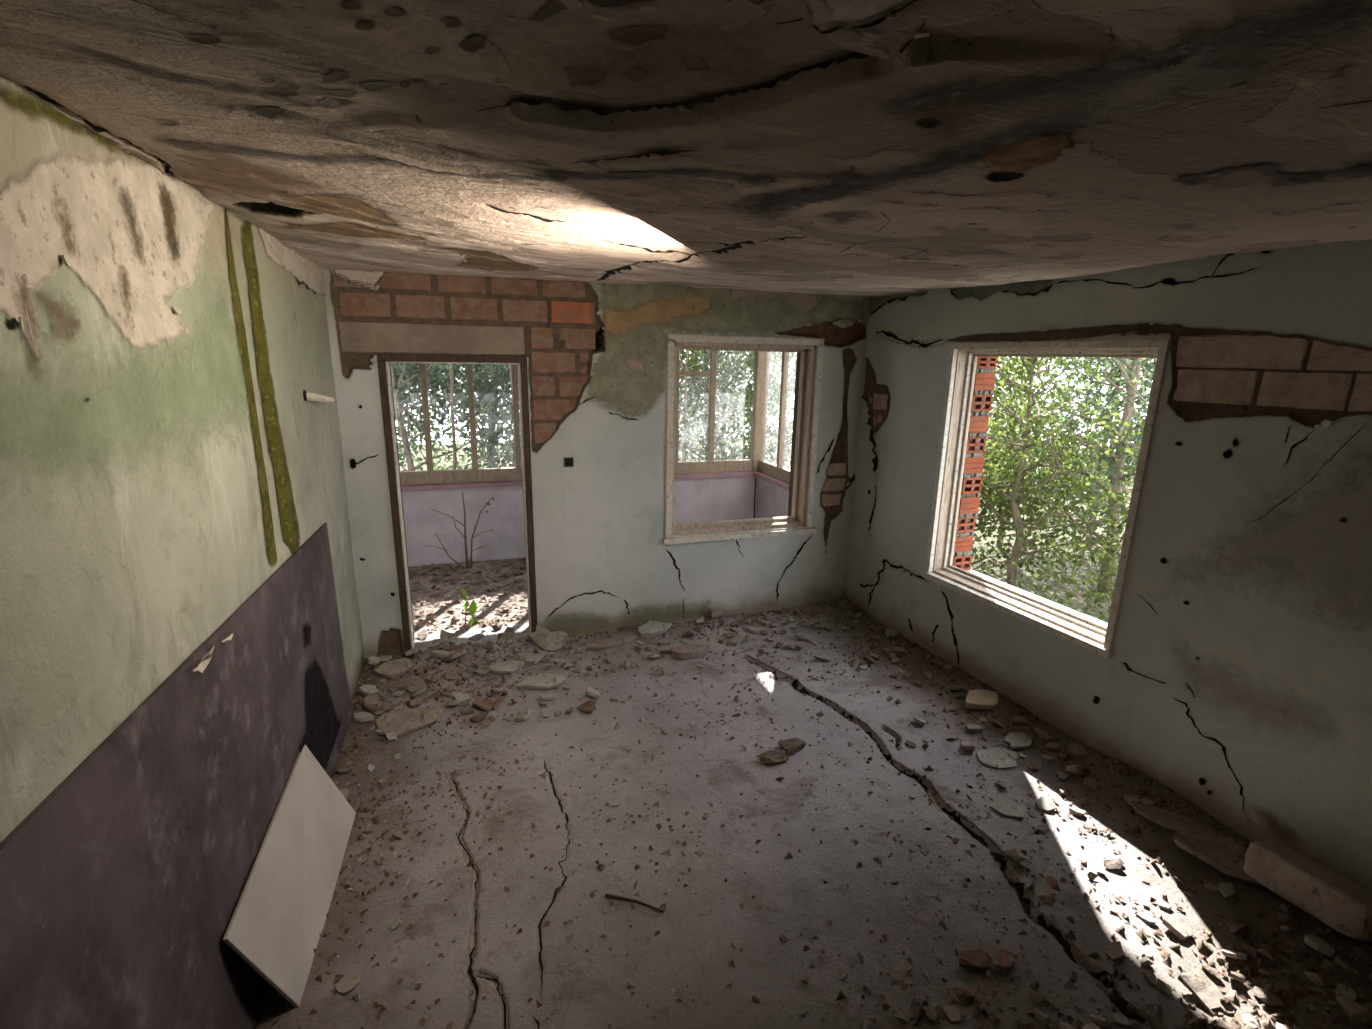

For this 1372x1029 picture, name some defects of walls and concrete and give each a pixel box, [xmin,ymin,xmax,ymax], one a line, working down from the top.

water stain [160,0,1372,223]
water stain [121,191,142,261]
water stain [0,215,300,554]
water stain [161,187,178,260]
peeling [0,153,605,454]
crack [486,204,566,245]
crack [597,236,806,281]
flaking render [730,289,928,553]
peeling [949,280,1053,300]
flaking render [947,322,1372,429]
crack [445,757,570,1029]
crack [715,643,1170,1029]